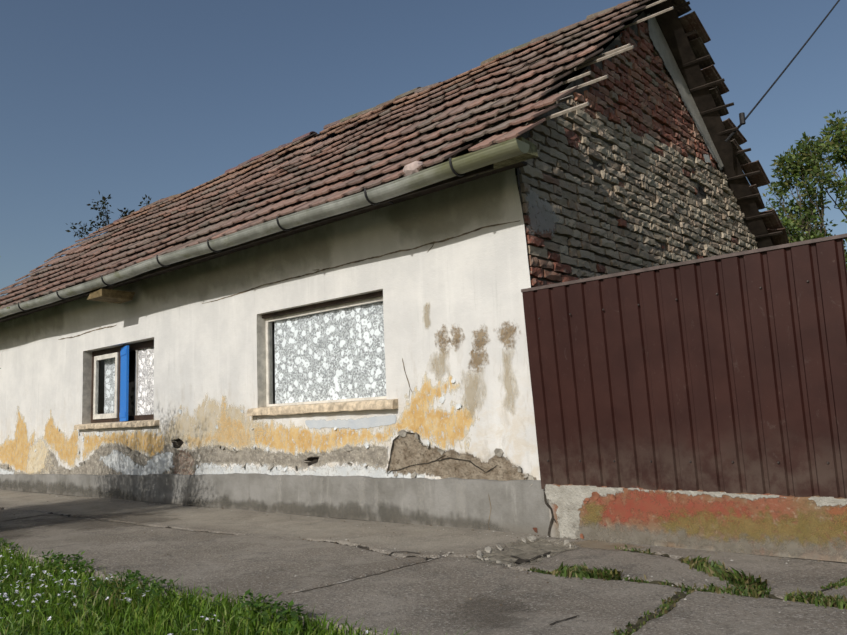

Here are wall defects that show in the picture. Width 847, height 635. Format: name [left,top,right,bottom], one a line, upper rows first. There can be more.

crack [202,220,520,304]
water stain [433,326,464,372]
water stain [465,329,488,411]
water stain [499,323,516,407]
spalling [0,374,536,487]
crack [0,507,238,535]
spalling [808,497,847,507]
crack [288,541,452,594]
crack [508,491,847,635]